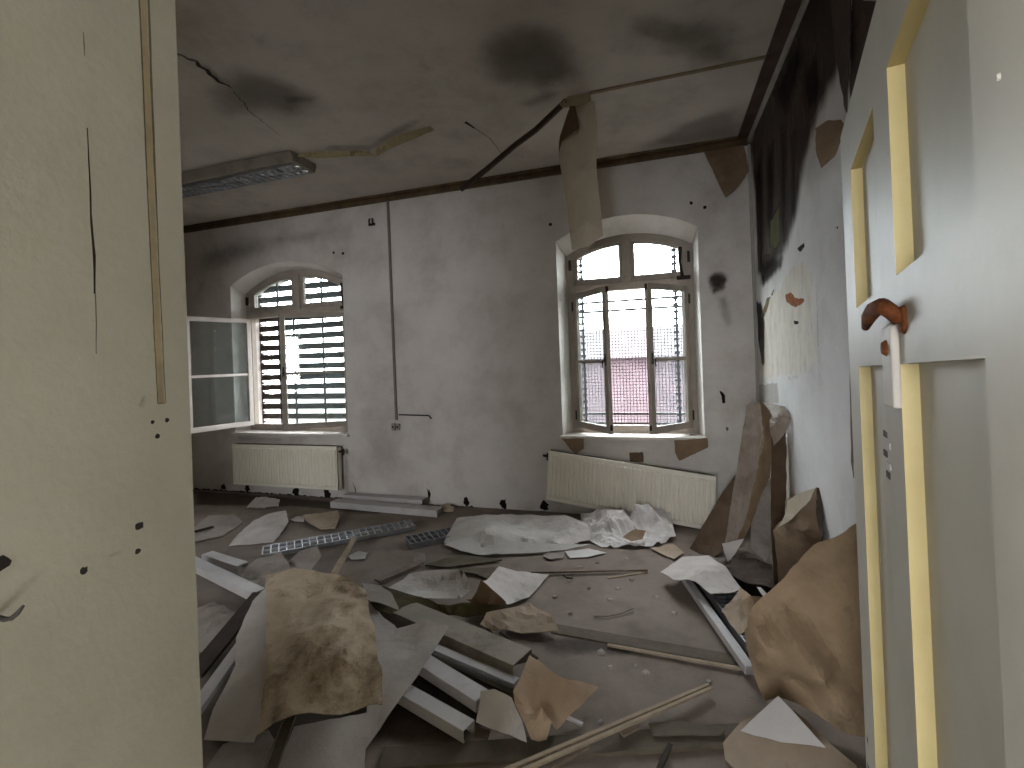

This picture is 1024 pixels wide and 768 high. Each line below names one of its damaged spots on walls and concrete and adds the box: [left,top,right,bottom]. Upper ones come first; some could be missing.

crack [177,53,277,133]
leakage [751,0,837,284]
crack [87,128,97,354]
leakage [709,274,726,292]
peeling [758,243,822,398]